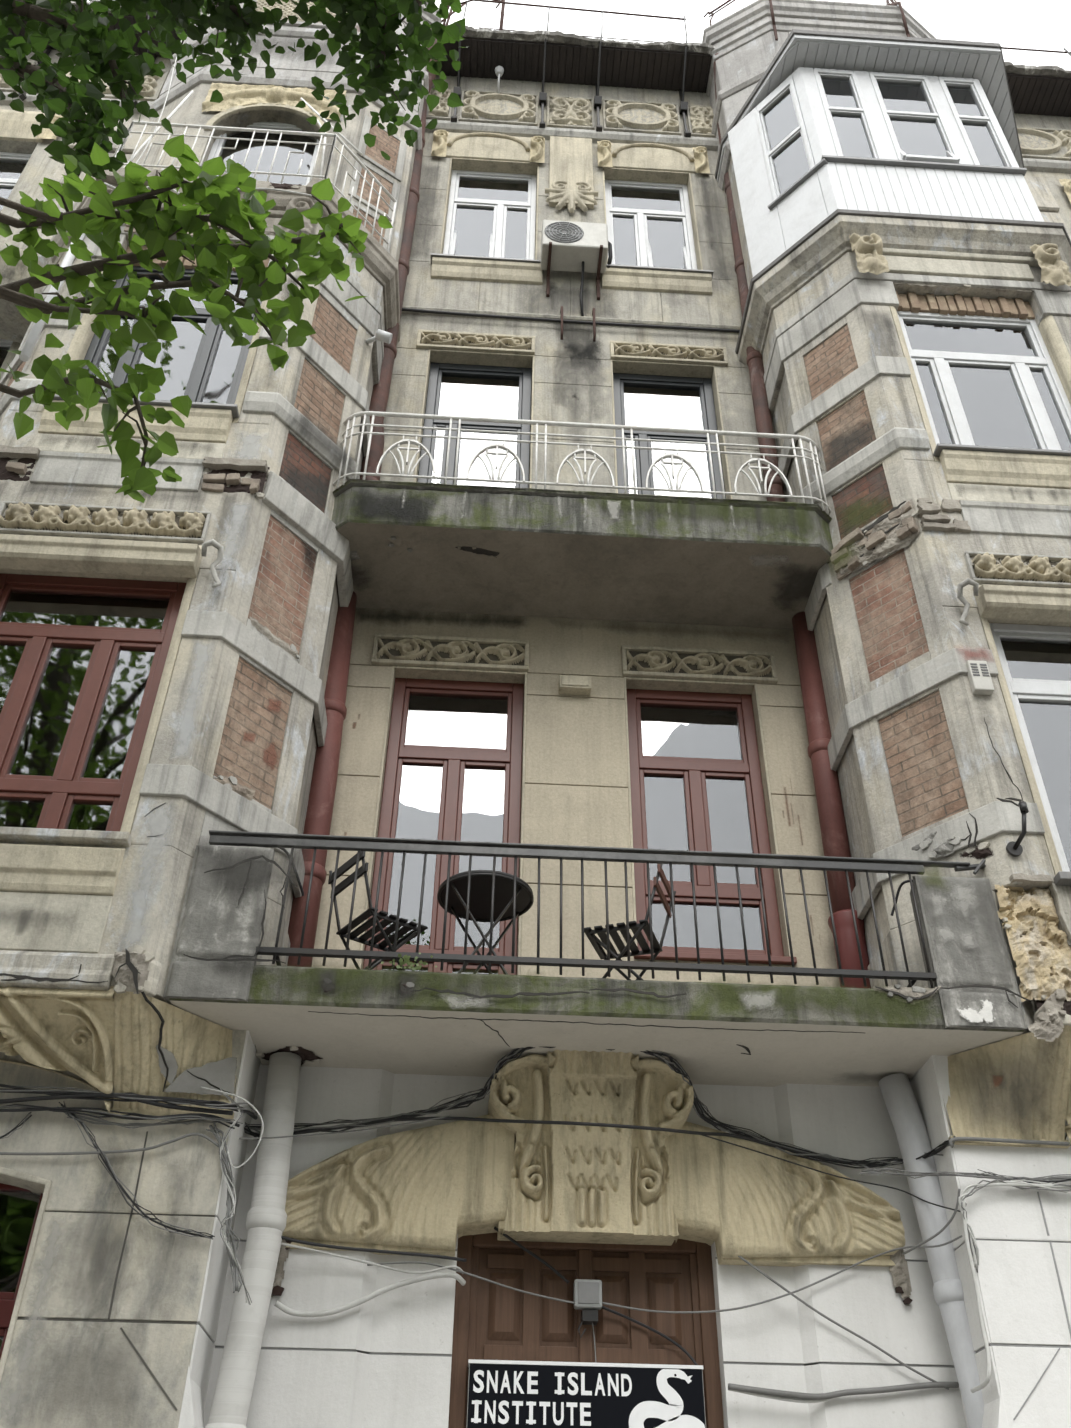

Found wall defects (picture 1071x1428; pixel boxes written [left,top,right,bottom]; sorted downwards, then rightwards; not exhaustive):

damp [563,323,598,366]
damp [608,502,633,518]
spalling [830,498,971,581]
spalling [994,873,1071,1021]
crack [0,949,231,1093]
damp [746,995,771,1006]
peeling [957,1000,996,1023]